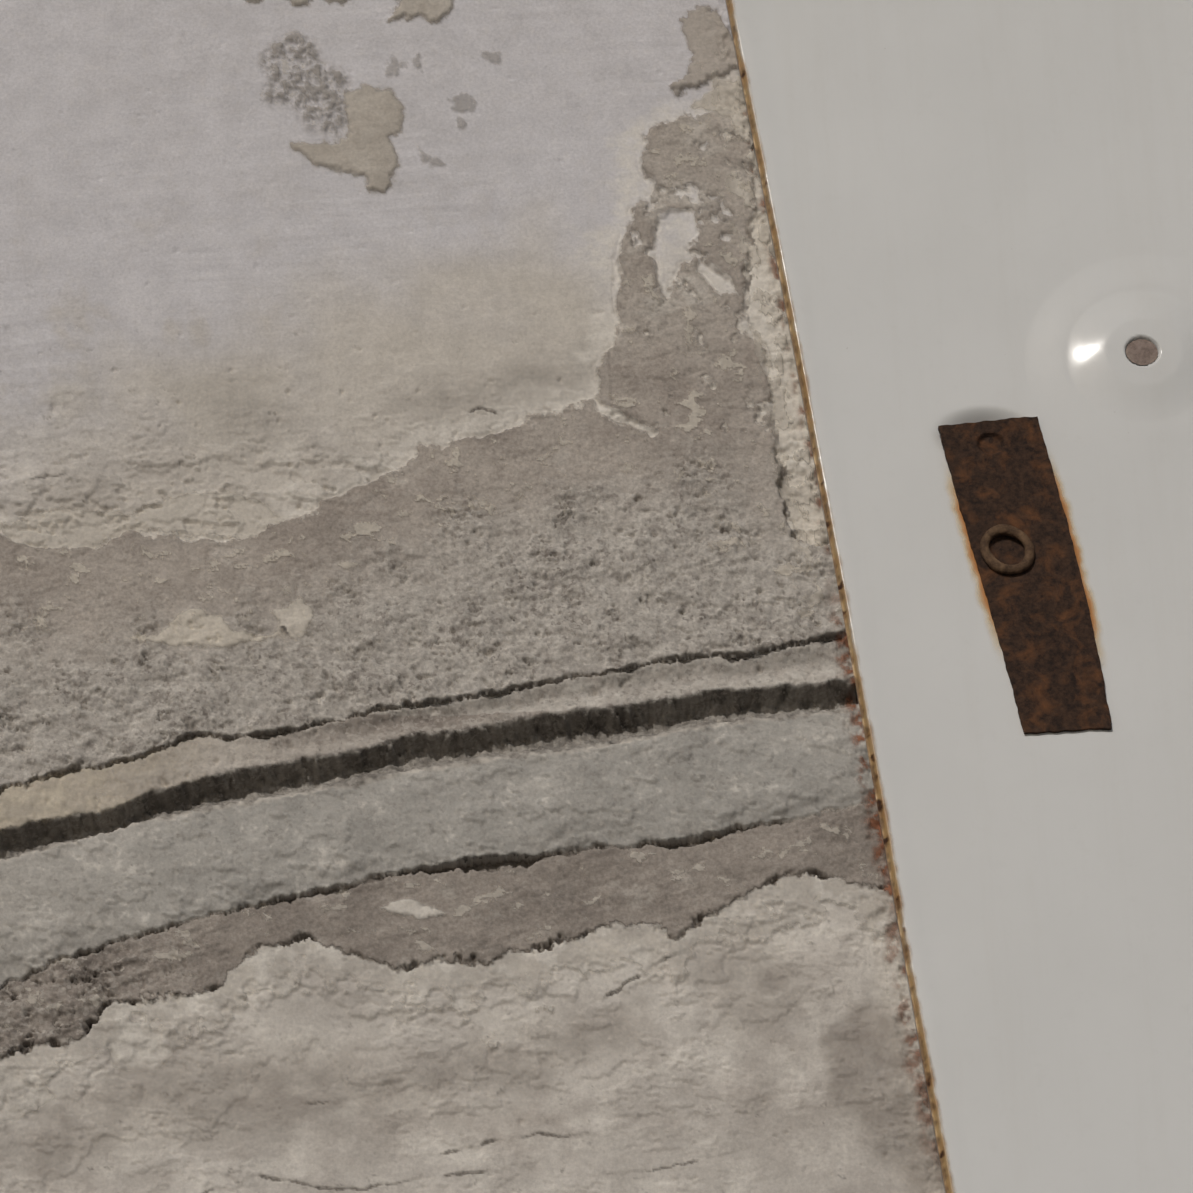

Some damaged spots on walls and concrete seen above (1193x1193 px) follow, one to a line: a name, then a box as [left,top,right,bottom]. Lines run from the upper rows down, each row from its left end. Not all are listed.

peeling [388,0,453,23]
flaking render [0,6,846,794]
corrosion [955,493,994,625]
corrosion [1055,477,1097,637]
crack [670,650,780,664]
flaking render [0,802,890,1120]
flaking render [870,906,897,935]